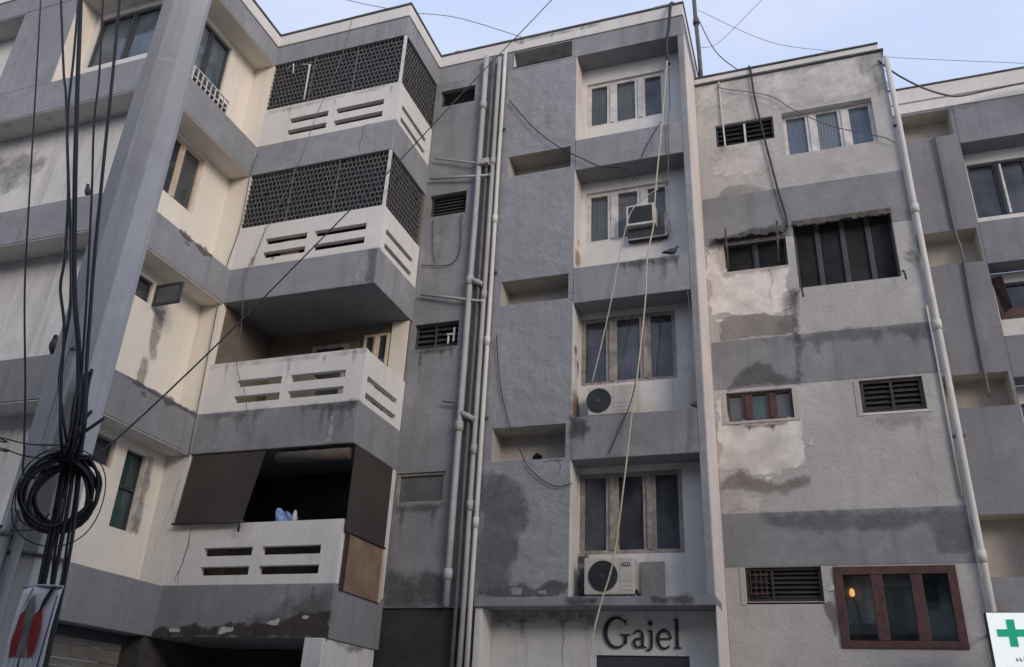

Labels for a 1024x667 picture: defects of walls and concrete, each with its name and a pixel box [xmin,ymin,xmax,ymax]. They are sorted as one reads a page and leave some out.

peeling [706,247,794,341]
damp [137,310,165,385]
damp [731,363,800,388]
peeling [714,395,814,482]
damp [132,460,151,532]
damp [723,471,809,493]
spalling [151,611,331,641]